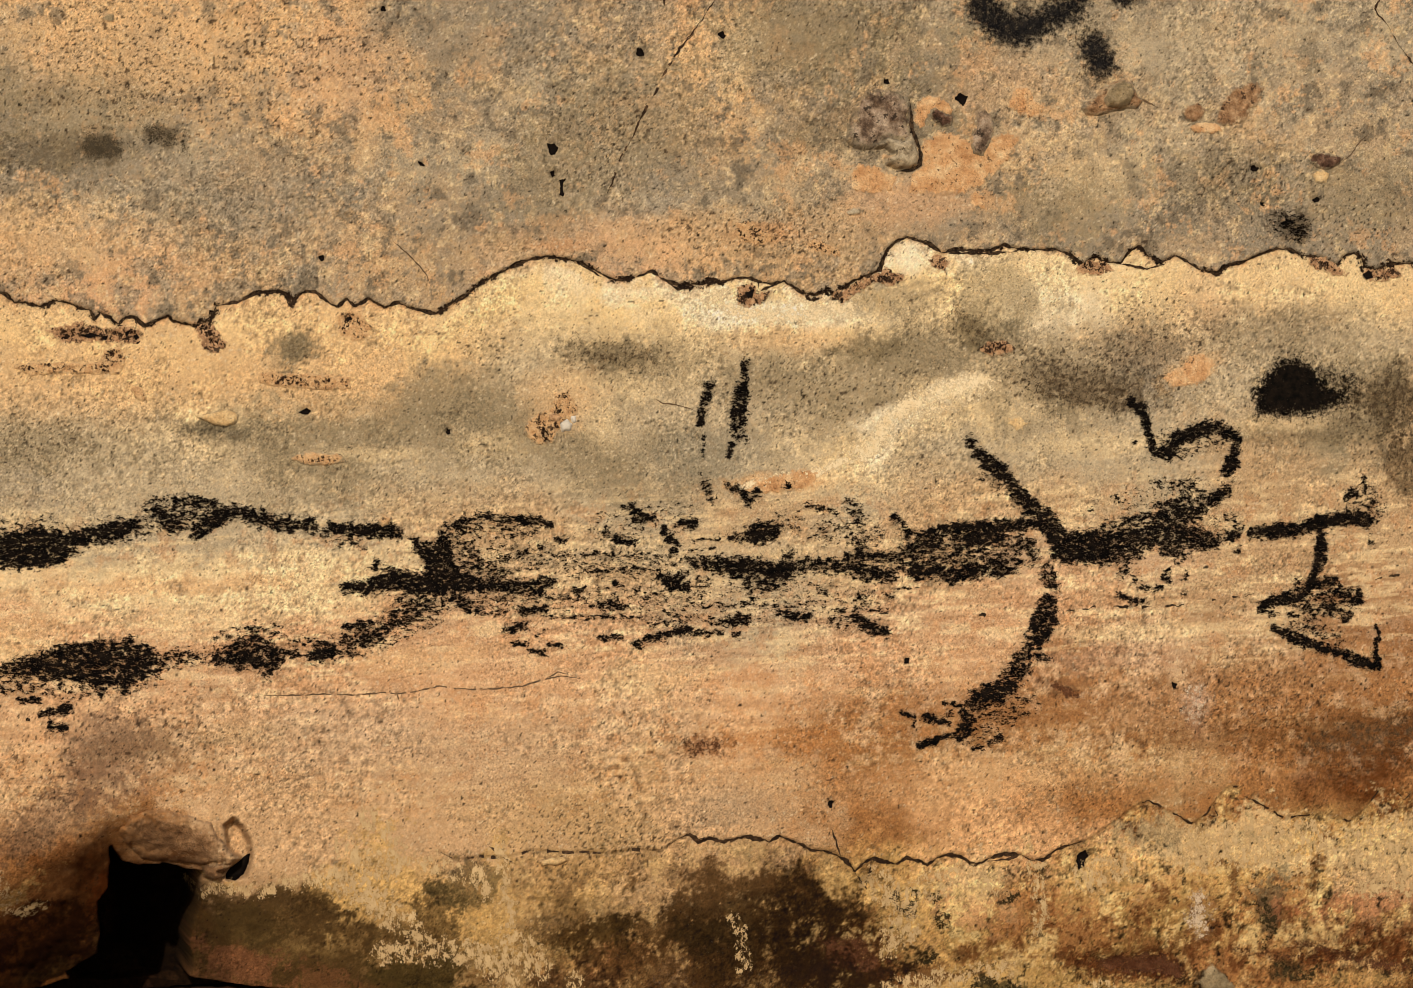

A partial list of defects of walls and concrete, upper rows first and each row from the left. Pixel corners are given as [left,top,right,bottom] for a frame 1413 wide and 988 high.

crack [0,236,1413,334]
crack [1142,785,1411,835]
crack [441,830,1082,892]
leakage [1183,891,1216,938]